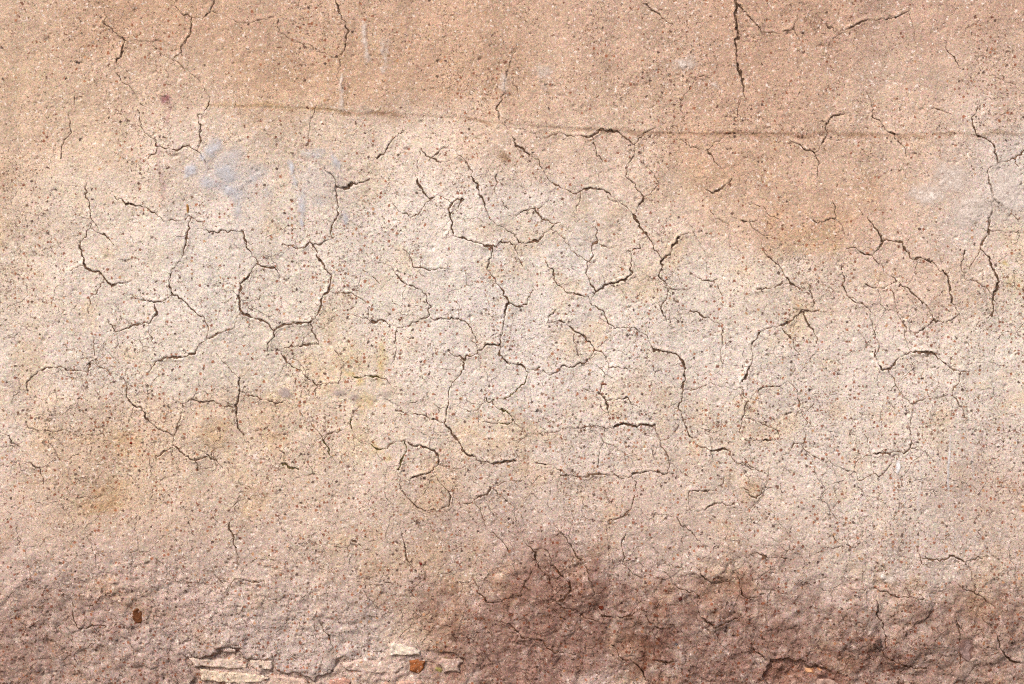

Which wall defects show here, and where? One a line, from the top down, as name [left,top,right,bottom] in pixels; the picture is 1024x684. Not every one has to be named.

crack [70,0,1024,551]
crack [0,425,104,483]
crack [26,340,285,589]
crack [72,593,110,656]
crack [363,526,414,609]
crack [472,526,691,655]
crack [611,644,674,681]
crack [665,563,766,629]
crack [843,545,1020,672]